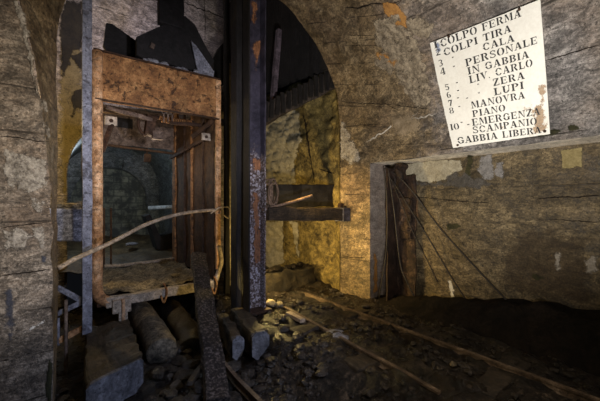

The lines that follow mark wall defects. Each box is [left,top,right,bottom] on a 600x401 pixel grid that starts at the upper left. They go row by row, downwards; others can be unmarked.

crack [345,0,402,9]
spalling [373,14,434,108]
crack [303,116,334,182]
peeling [406,159,462,183]
peeling [478,154,503,180]
crack [533,193,599,201]